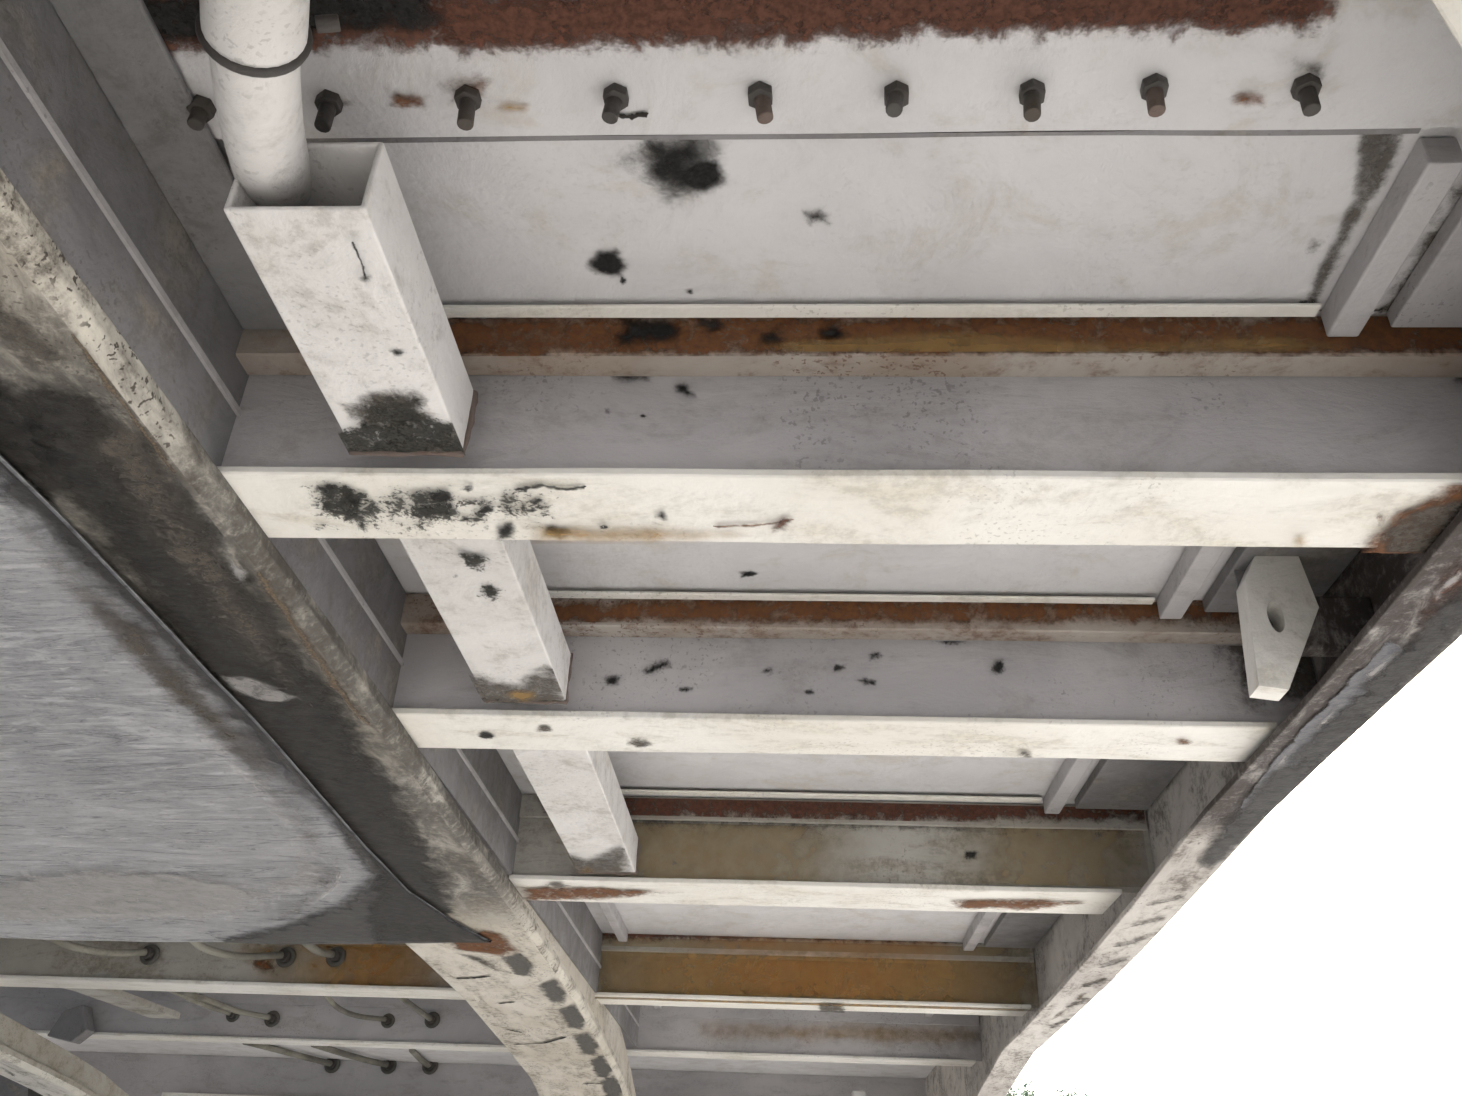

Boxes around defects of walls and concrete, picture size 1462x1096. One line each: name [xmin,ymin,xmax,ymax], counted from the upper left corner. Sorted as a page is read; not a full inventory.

rust [143,0,205,54]
rust [309,0,1336,58]
rust [1236,94,1261,104]
rust [448,316,1462,357]
rust [1368,485,1462,554]
rust [553,599,1239,625]
rust [524,798,1145,911]
rust [595,933,1039,1011]